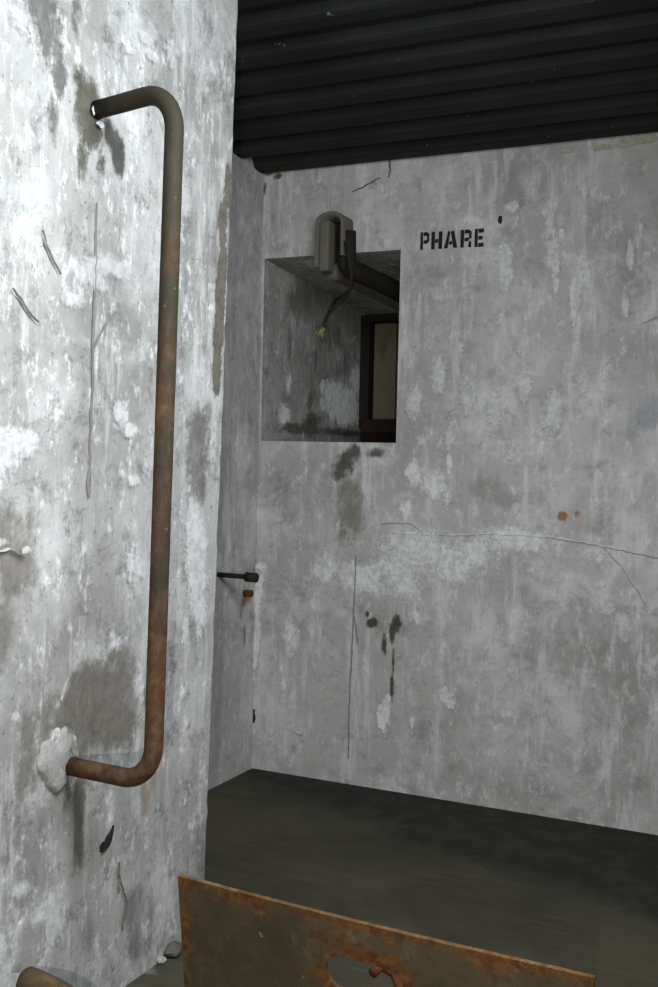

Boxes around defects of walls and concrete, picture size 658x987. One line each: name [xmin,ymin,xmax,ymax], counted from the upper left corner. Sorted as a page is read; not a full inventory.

water stain [310,525,550,701]
water stain [20,645,136,799]